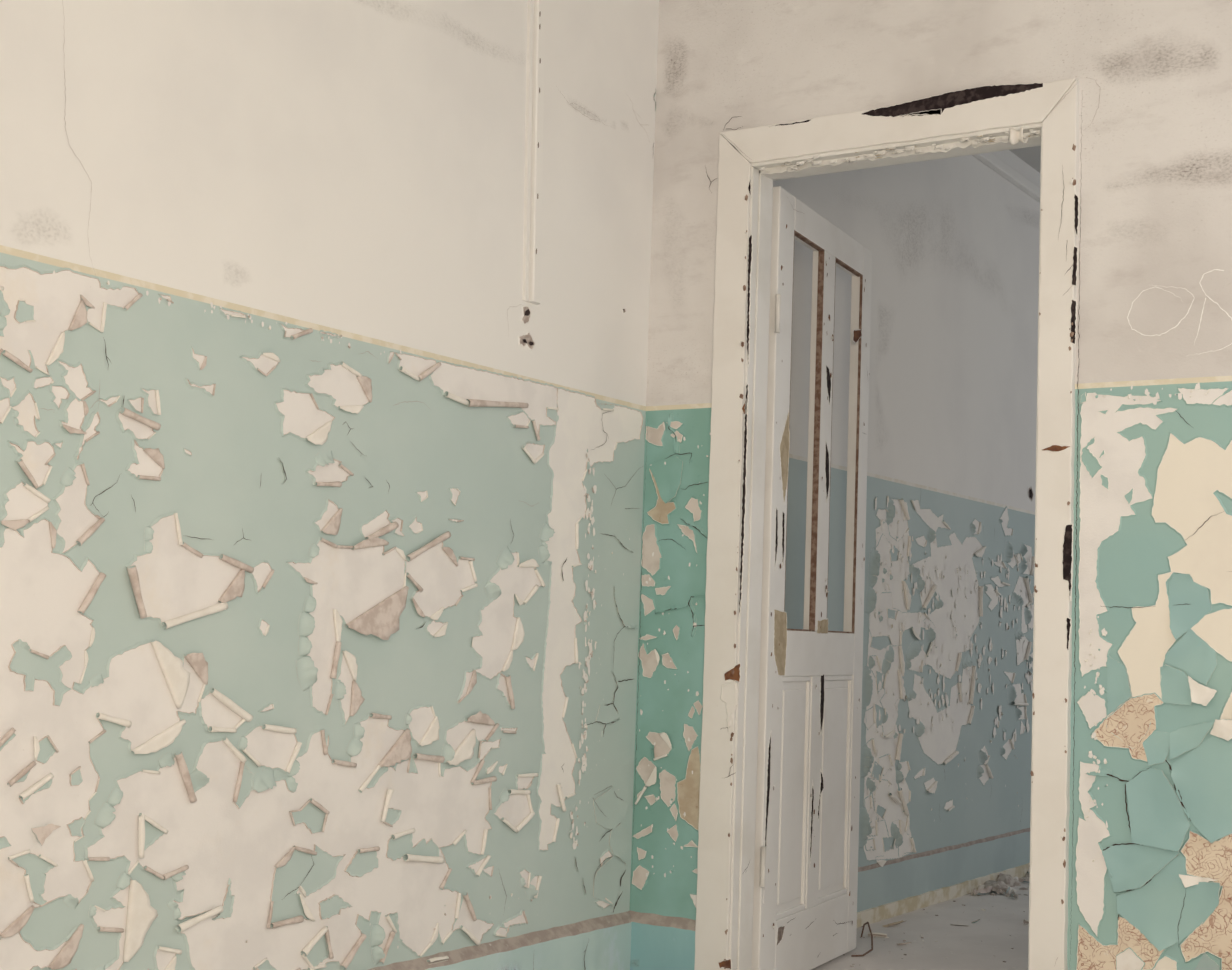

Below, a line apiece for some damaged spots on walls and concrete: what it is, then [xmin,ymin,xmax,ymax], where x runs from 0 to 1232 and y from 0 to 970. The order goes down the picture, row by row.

spalling [861,82,1044,118]
crack [575,411,708,913]
peeling [851,496,1038,867]
peeling [1041,383,1232,970]